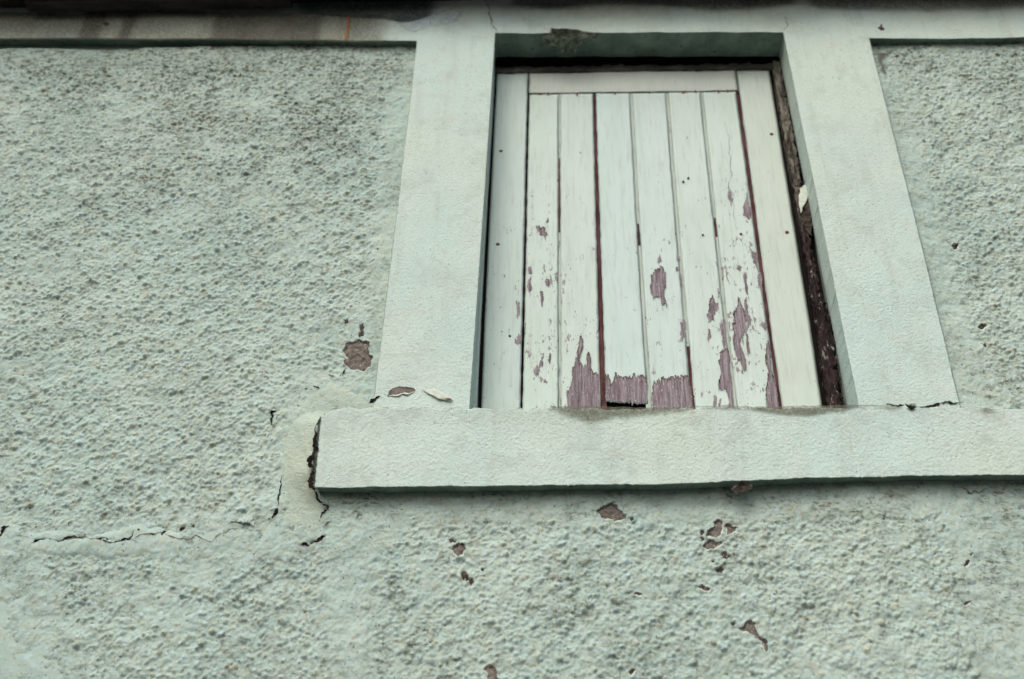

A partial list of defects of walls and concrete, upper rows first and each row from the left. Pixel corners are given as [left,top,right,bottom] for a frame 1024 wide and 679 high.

flaking render [540,28,599,56]
peeling [650,254,683,307]
flaking render [329,320,373,376]
flaking render [369,386,453,403]
peeling [566,335,693,409]
peeling [706,249,779,410]
crack [890,401,962,409]
crack [0,478,282,543]
crack [301,421,331,546]
flaking render [597,502,633,522]
flaking render [700,519,737,573]
flaking render [731,619,768,652]